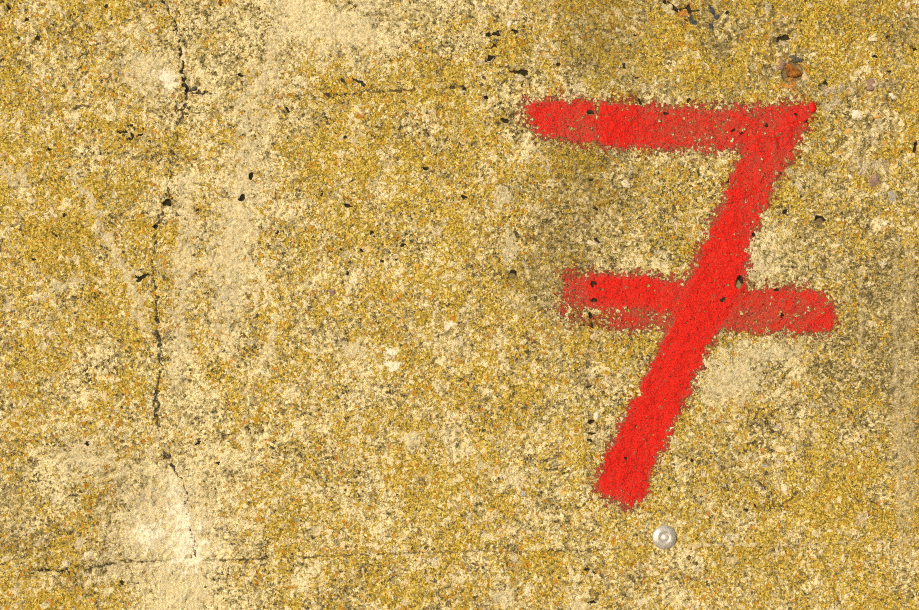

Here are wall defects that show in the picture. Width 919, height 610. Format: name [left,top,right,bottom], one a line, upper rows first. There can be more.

crack [149,0,212,558]
crack [324,78,415,97]